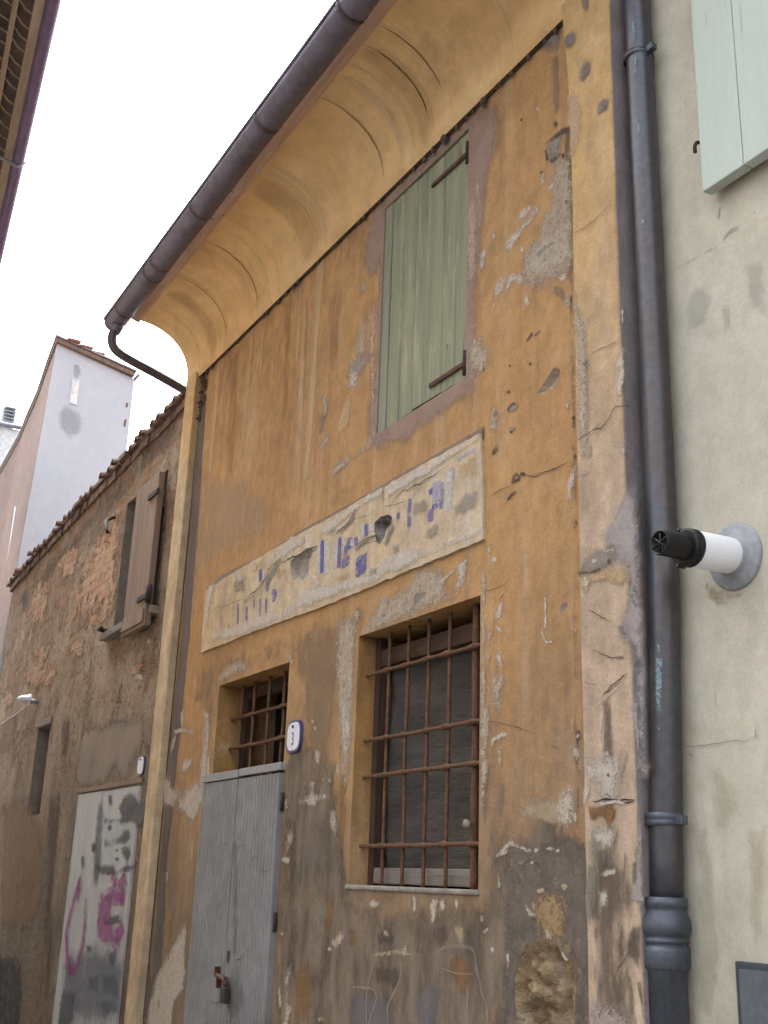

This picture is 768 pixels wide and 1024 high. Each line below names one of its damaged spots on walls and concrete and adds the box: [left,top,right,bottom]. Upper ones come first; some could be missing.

spalling [262,261,319,319]
flaking render [319,94,581,475]
spalling [195,329,250,422]
peeling [321,391,518,534]
crack [491,405,628,496]
flaking render [58,508,124,658]
crack [215,467,445,608]
peeling [163,710,211,823]
peeling [205,515,477,836]
peeling [555,720,622,829]
crack [684,731,758,757]
leakage [277,748,571,1024]